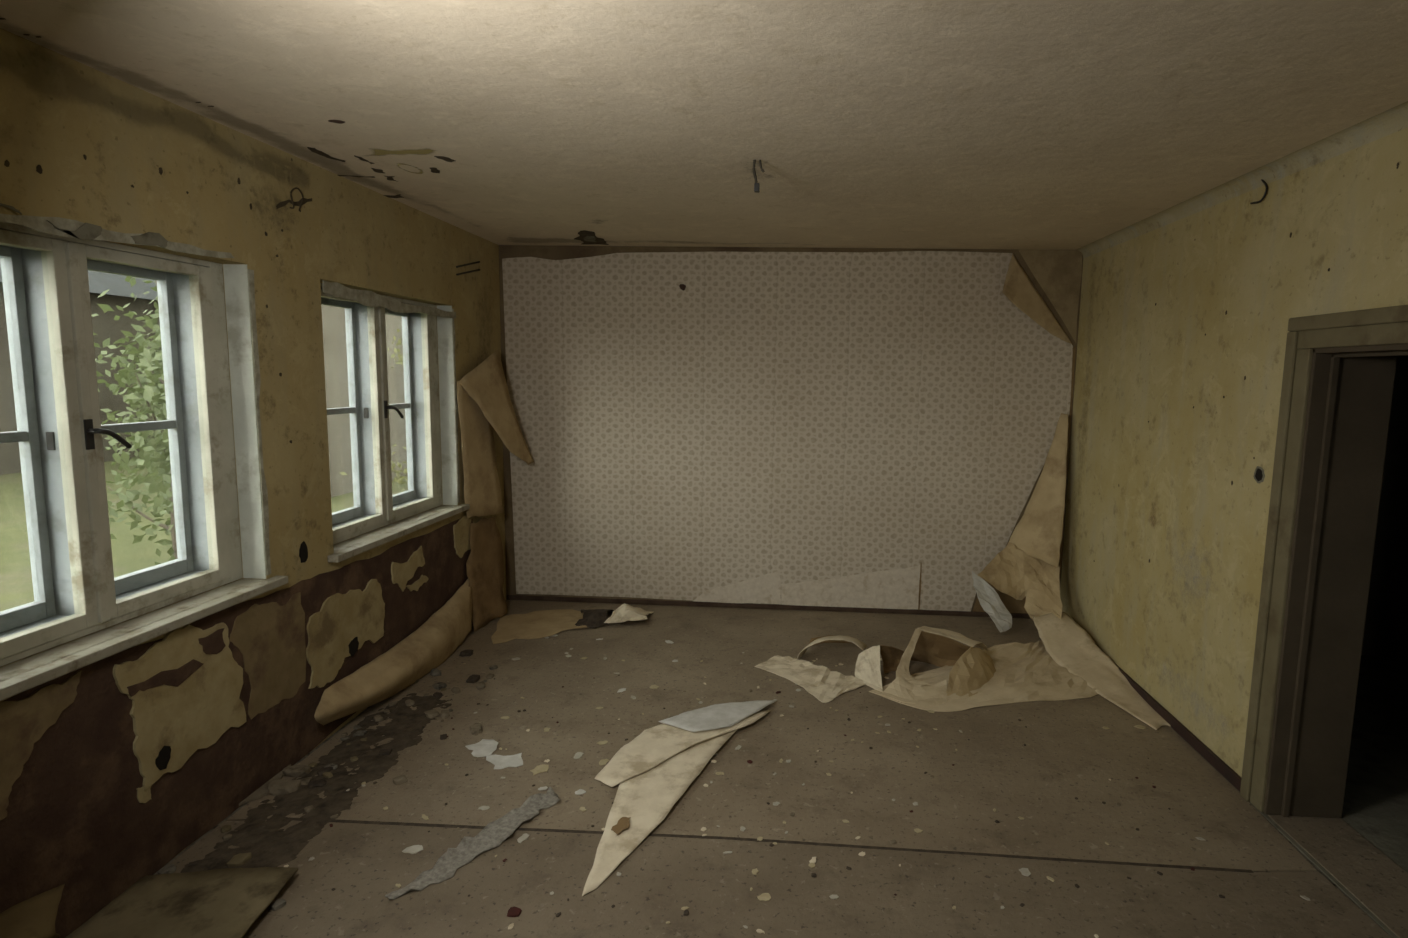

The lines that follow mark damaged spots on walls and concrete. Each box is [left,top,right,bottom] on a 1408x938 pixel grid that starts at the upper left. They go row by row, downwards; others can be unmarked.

flaking render [1066,346,1076,473]
peeling [0,269,473,938]
flaking render [985,580,1028,614]